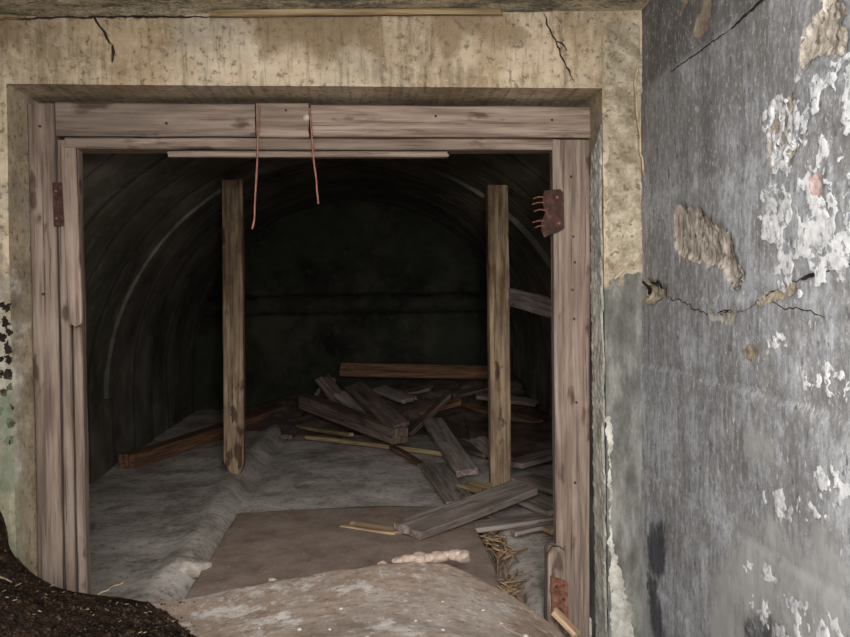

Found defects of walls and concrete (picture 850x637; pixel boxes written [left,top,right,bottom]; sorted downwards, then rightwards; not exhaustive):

crack [0,15,247,63]
crack [543,13,574,81]
crack [671,0,764,72]
peeling [757,0,850,308]
crack [670,270,830,317]
water stain [0,273,22,484]